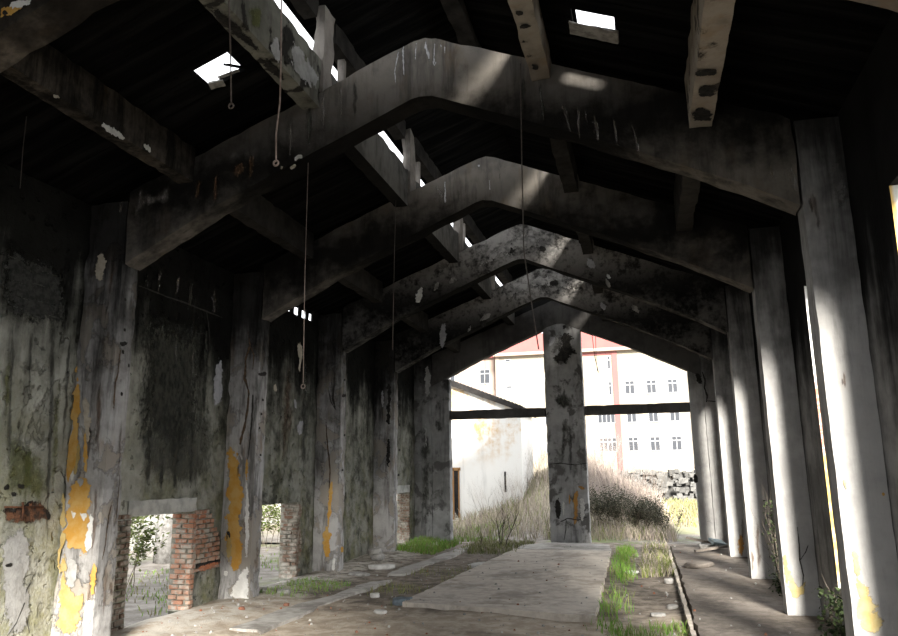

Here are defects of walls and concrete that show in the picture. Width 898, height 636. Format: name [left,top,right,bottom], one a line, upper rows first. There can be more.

spalling [102,123,125,140]
flaking render [691,108,713,121]
flaking render [695,69,717,97]
leakage [138,307,209,487]
peeling [3,366,97,634]
peeling [192,443,248,576]
peeling [322,481,343,570]
peeling [783,555,806,598]
peeling [852,551,883,633]